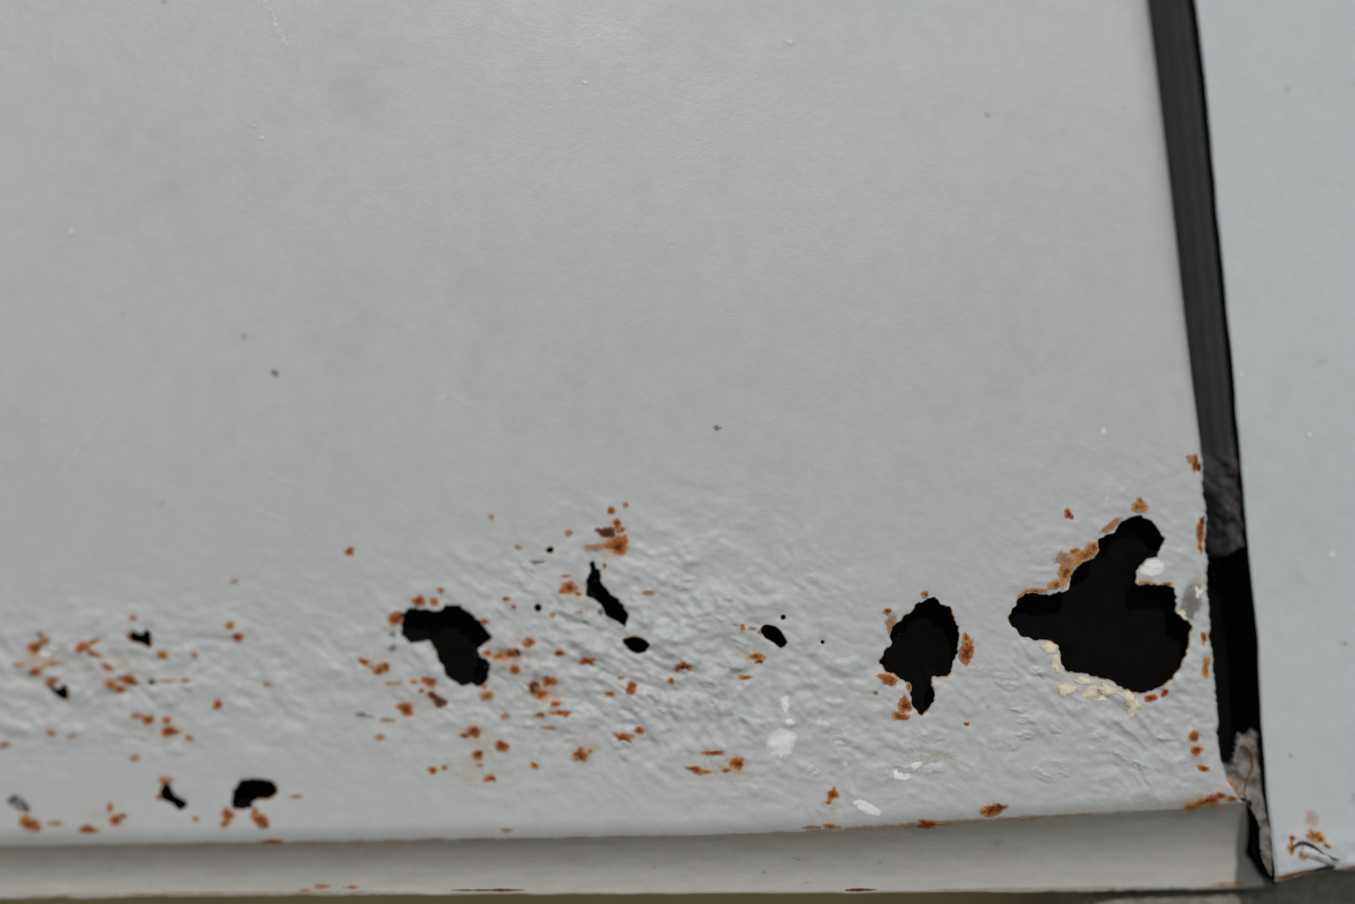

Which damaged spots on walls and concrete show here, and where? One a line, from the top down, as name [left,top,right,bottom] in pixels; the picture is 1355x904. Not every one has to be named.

rust [387,587,445,627]
rust [549,502,639,625]
rust [1017,497,1148,599]
peeling [1140,559,1167,577]
peeling [1177,578,1204,621]
rust [12,614,213,752]
rust [353,653,449,741]
rust [410,618,596,796]
rust [958,631,975,668]
peeling [1041,641,1142,718]
rust [564,726,645,769]
rust [682,750,762,788]